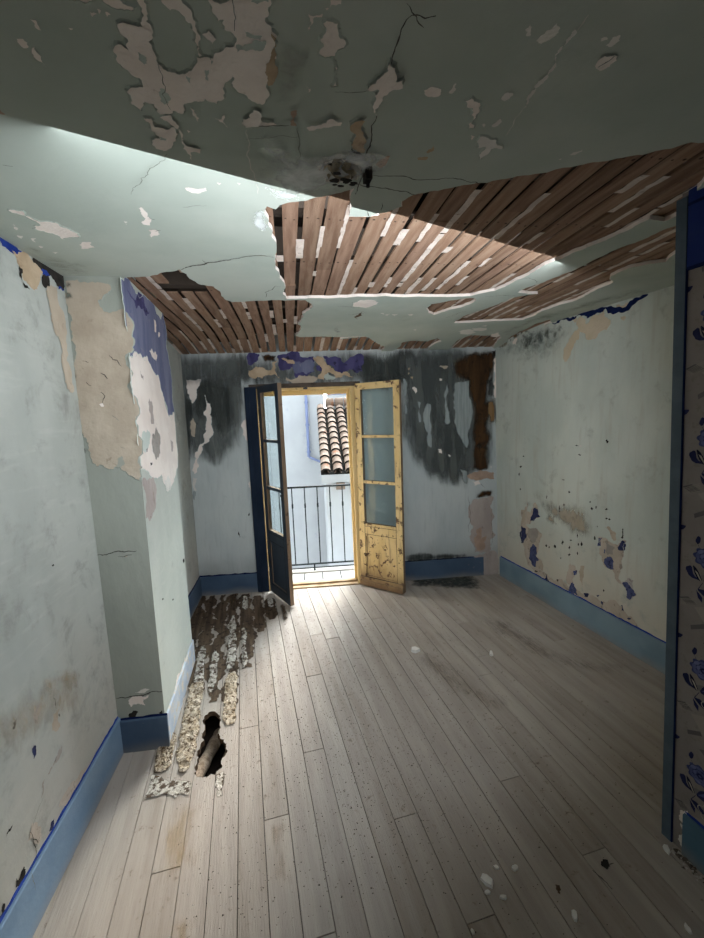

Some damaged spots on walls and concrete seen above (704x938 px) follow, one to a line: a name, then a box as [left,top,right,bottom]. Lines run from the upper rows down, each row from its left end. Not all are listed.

crack [391,4,436,64]
flaking render [90,0,704,363]
crack [355,116,491,216]
flaking render [452,226,676,400]
flaking render [13,251,178,521]
peeling [186,375,214,499]
leakage [181,356,295,462]
leakage [307,348,496,483]
spalling [467,466,499,575]